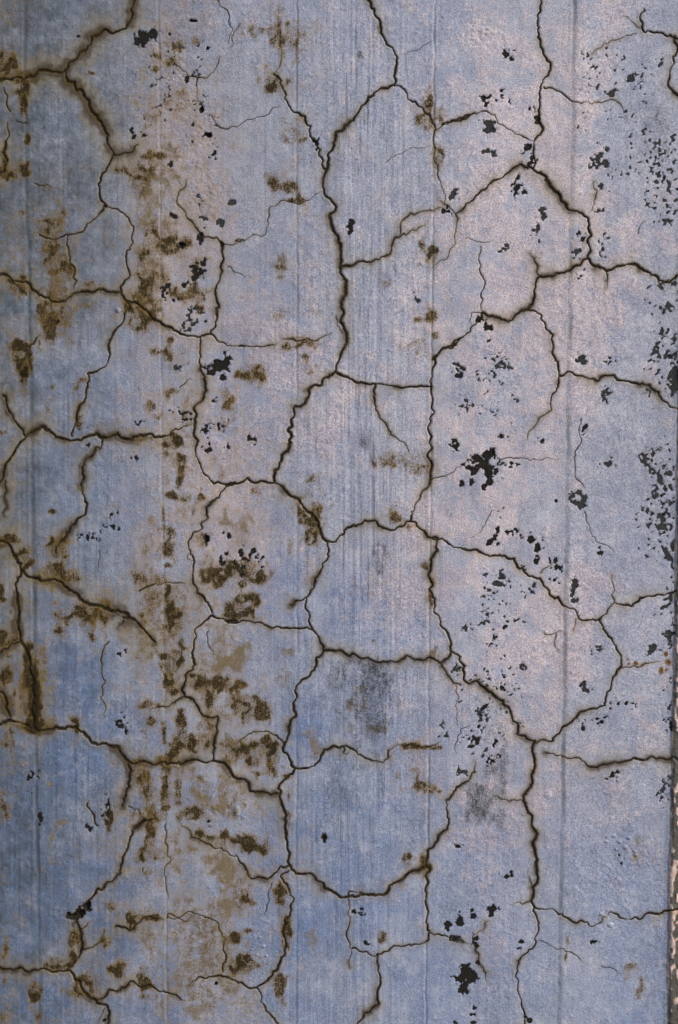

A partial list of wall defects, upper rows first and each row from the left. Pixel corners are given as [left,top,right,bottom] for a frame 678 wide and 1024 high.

rust [266,176,305,204]
peeling [580,47,678,226]
rust [123,219,211,334]
crack [0,0,678,613]
peeling [448,423,520,490]
peeling [486,507,582,603]
rust [0,629,53,752]
rust [132,431,290,873]
peeling [437,569,536,767]
crack [0,482,678,1024]
rust [205,928,260,977]
peeling [444,904,500,1024]